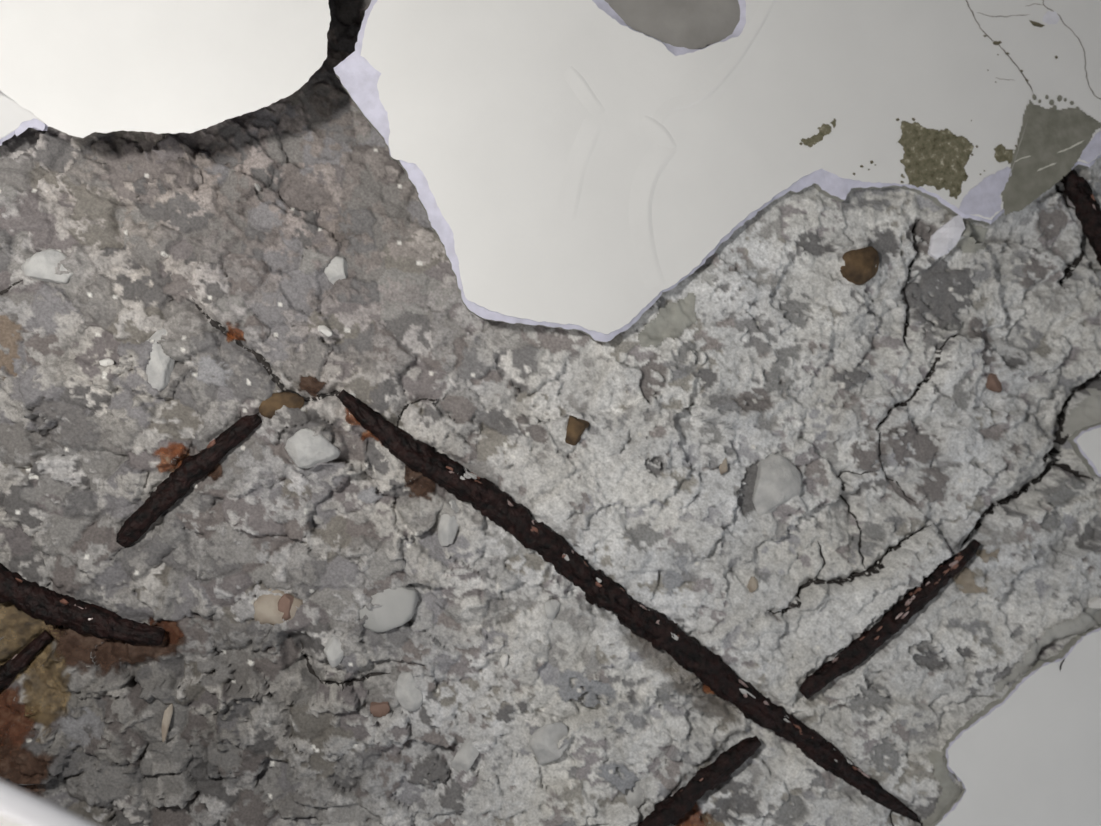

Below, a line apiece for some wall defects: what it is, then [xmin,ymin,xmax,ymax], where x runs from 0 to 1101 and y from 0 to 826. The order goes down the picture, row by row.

peeling [605,0,740,49]
crack [966,0,1101,99]
peeling [1001,99,1101,215]
crack [1059,234,1085,289]
corrosion [155,443,202,472]
spalling [284,428,340,469]
corrosion [299,375,326,397]
corrosion [404,465,436,501]
crack [766,219,957,614]
crack [960,370,1101,550]
spalling [337,389,921,826]
corrosion [0,601,185,797]